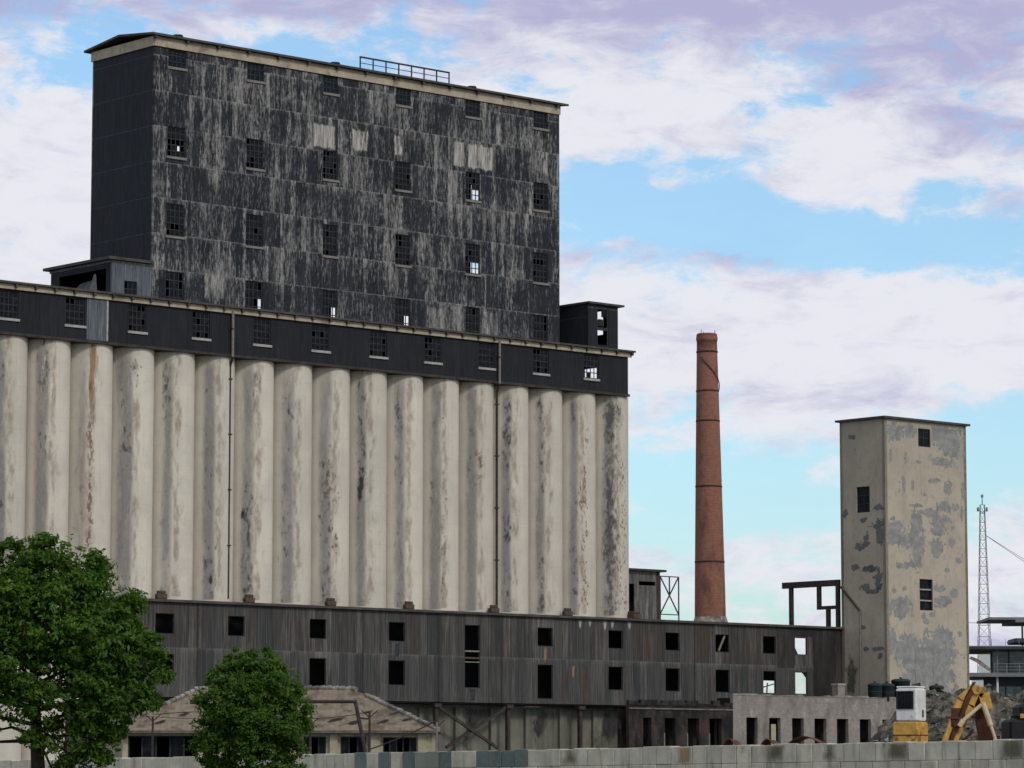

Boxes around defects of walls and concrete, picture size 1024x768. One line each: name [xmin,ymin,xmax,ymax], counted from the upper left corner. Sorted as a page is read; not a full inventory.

leakage [118,359,138,594]
leakage [242,458,259,593]
leakage [503,400,511,612]
leakage [604,403,620,628]
peeling [842,421,966,694]